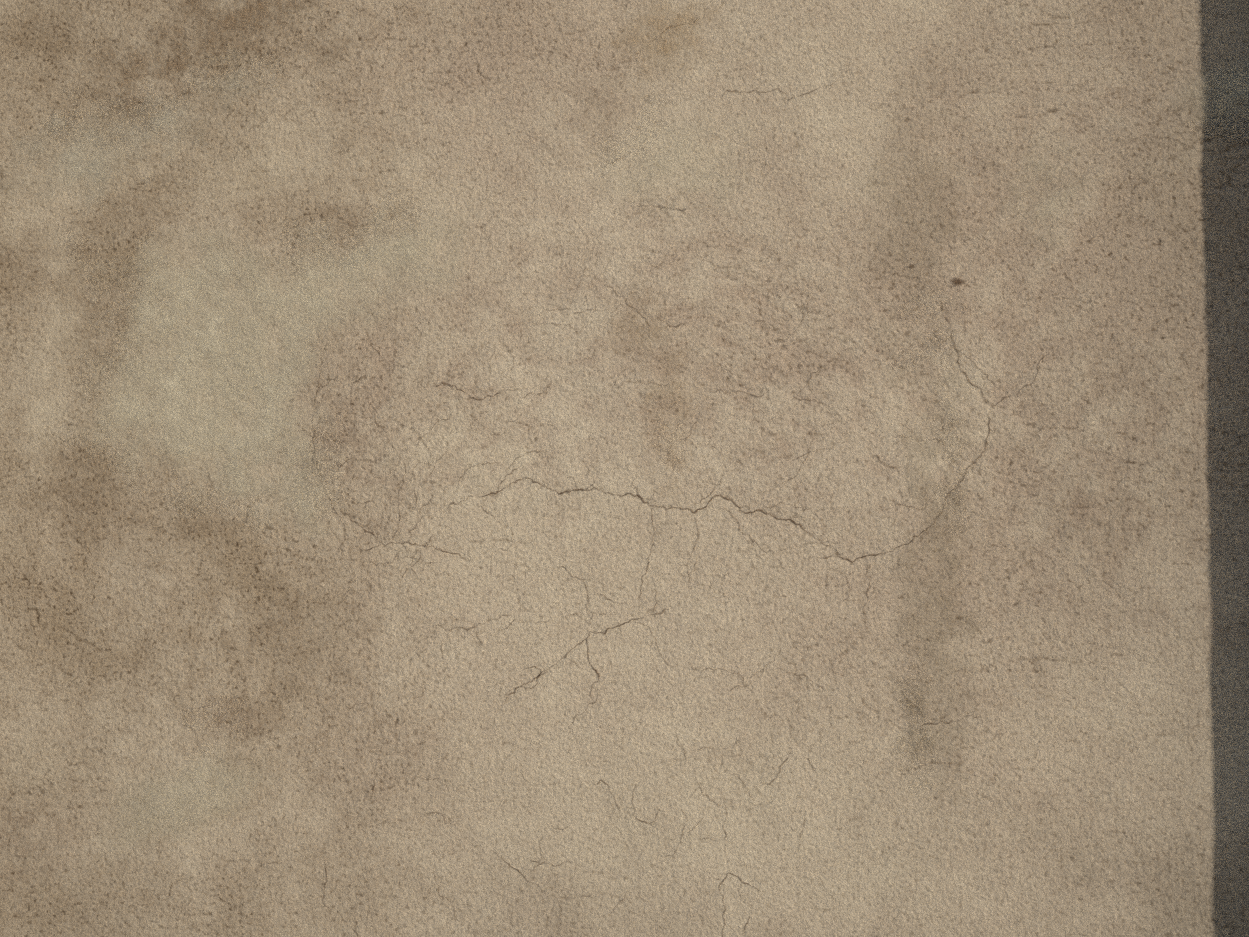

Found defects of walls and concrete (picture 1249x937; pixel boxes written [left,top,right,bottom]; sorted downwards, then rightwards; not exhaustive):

crack [453,451,584,505]
crack [622,490,804,541]
crack [826,503,935,600]
crack [575,553,656,701]